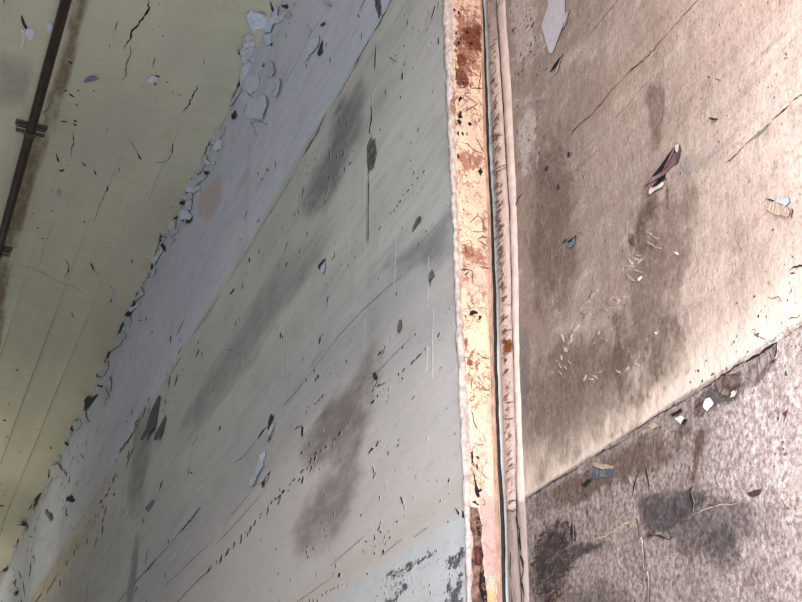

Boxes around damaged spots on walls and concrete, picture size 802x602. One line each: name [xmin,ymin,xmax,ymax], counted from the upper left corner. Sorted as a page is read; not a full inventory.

crack [122,0,150,80]
corrosion [454,7,482,87]
flaking render [508,0,570,85]
crack [192,0,392,336]
leakage [366,137,376,239]
spalling [671,327,795,425]
crack [118,410,144,468]
spalling [216,421,350,564]
spalling [374,451,495,602]
leakage [553,439,672,505]
leakage [640,490,705,537]
leakage [692,429,704,481]